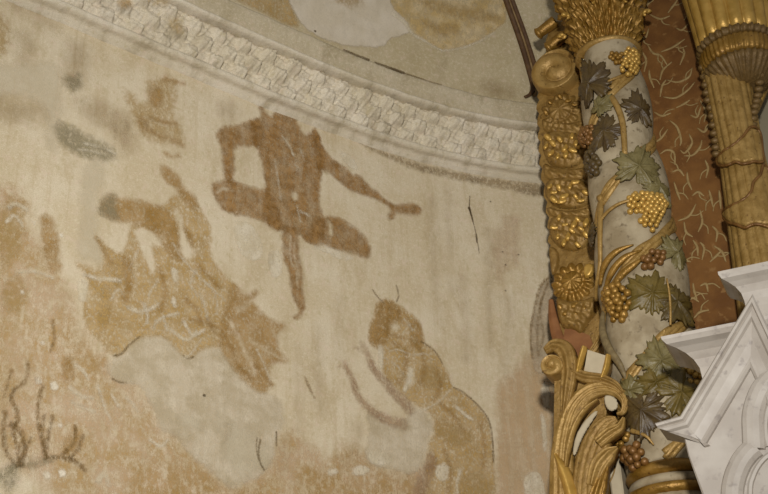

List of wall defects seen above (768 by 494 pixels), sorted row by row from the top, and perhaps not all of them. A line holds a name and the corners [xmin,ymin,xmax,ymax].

flaking render [241,0,506,51]
crack [343,49,439,84]